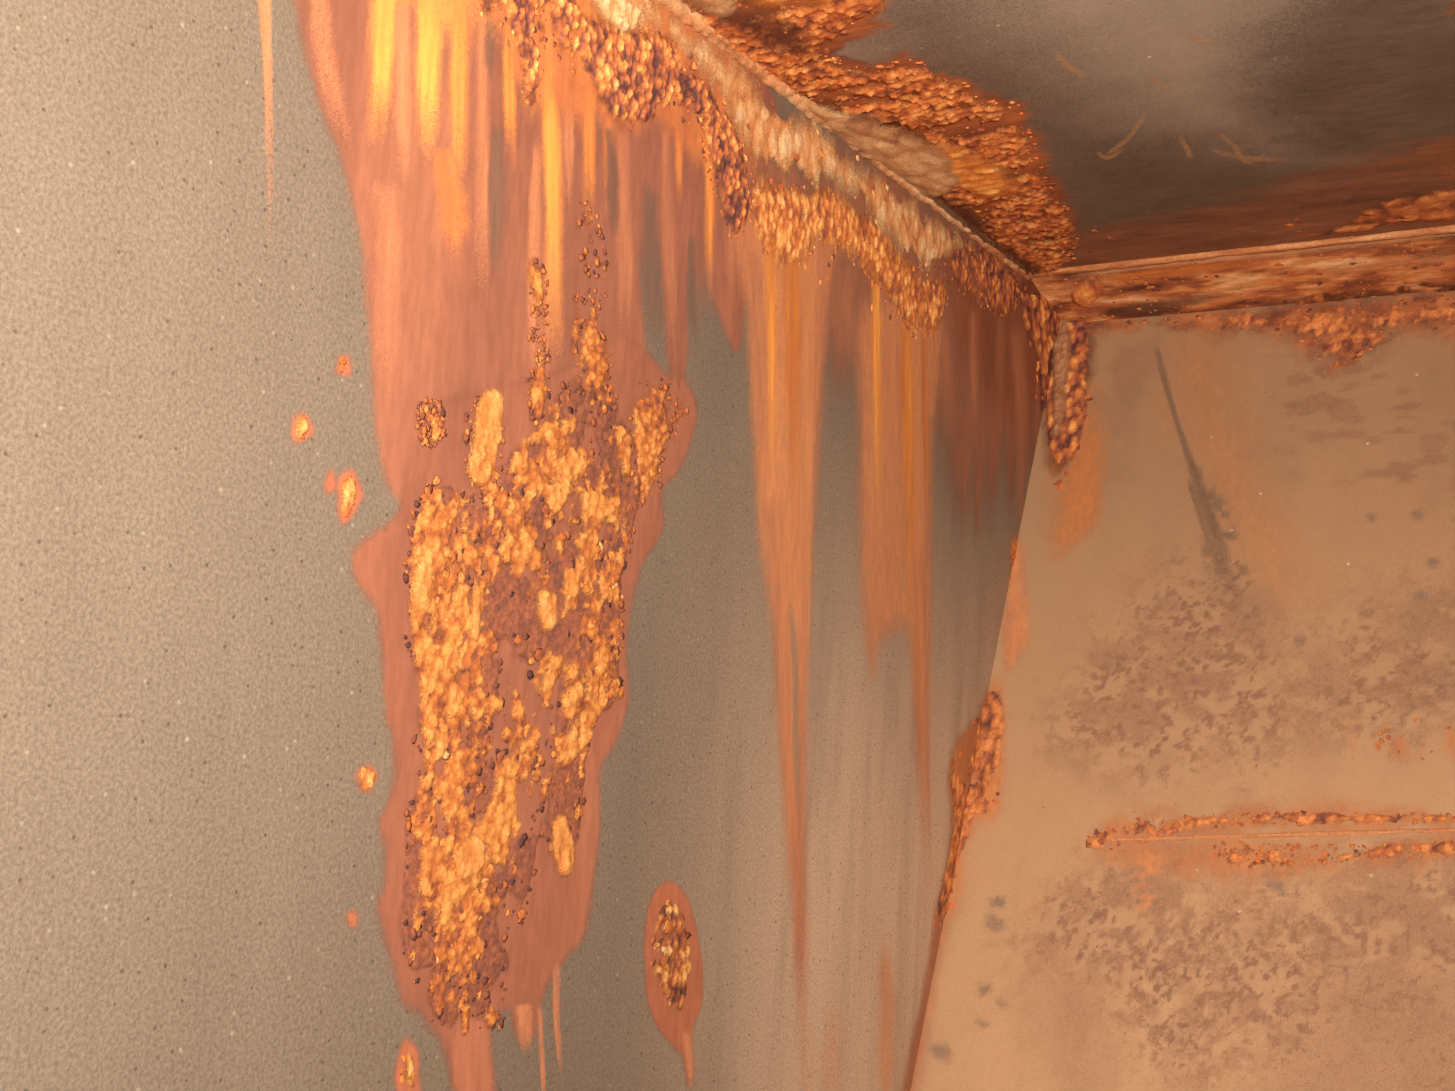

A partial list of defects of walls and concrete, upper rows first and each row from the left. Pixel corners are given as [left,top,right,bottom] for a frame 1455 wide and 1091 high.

corrosion [257,0,275,254]
corrosion [289,0,950,1091]
corrosion [902,530,1033,1091]
corrosion [682,0,1455,564]
corrosion [1068,789,1455,921]